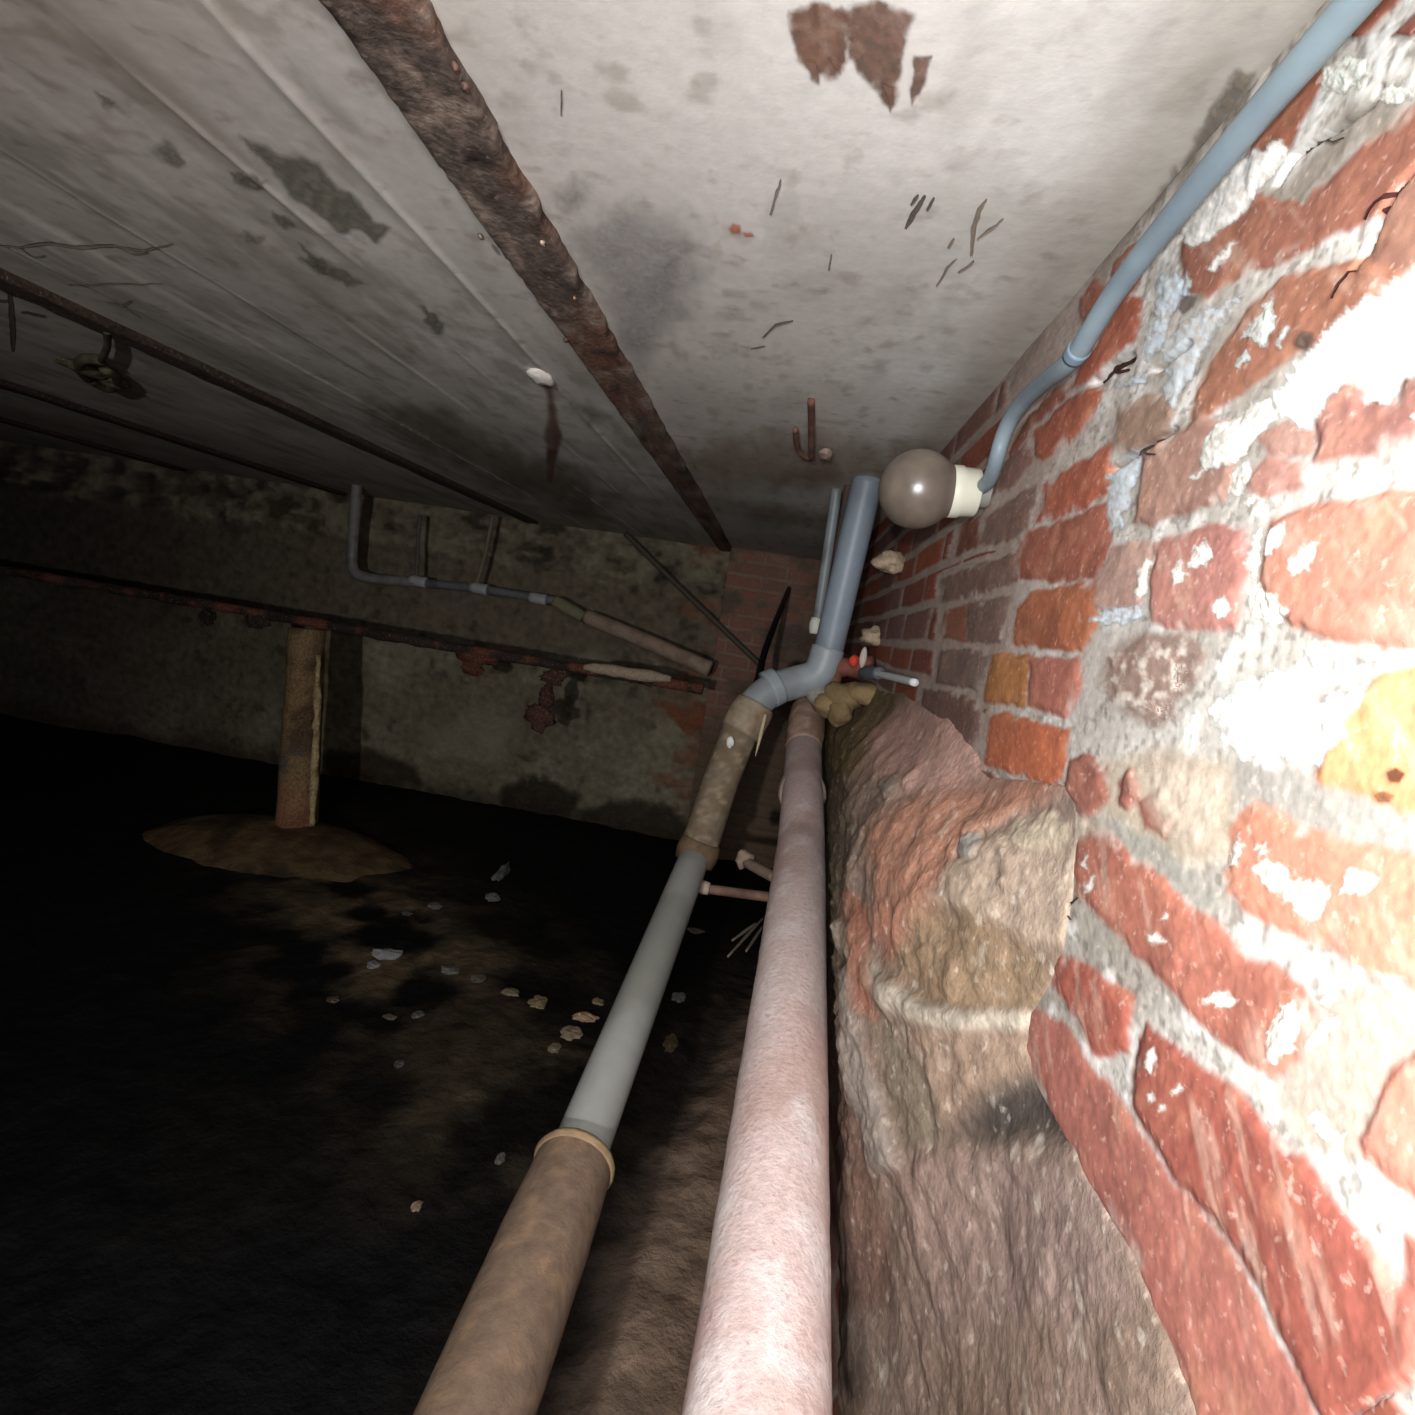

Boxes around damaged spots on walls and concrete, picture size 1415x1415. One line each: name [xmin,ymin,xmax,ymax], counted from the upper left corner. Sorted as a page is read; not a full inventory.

water stain [1186,72,1251,165]
crack [1363,182,1408,220]
crack [1330,270,1356,298]
corrosion [546,386,561,482]